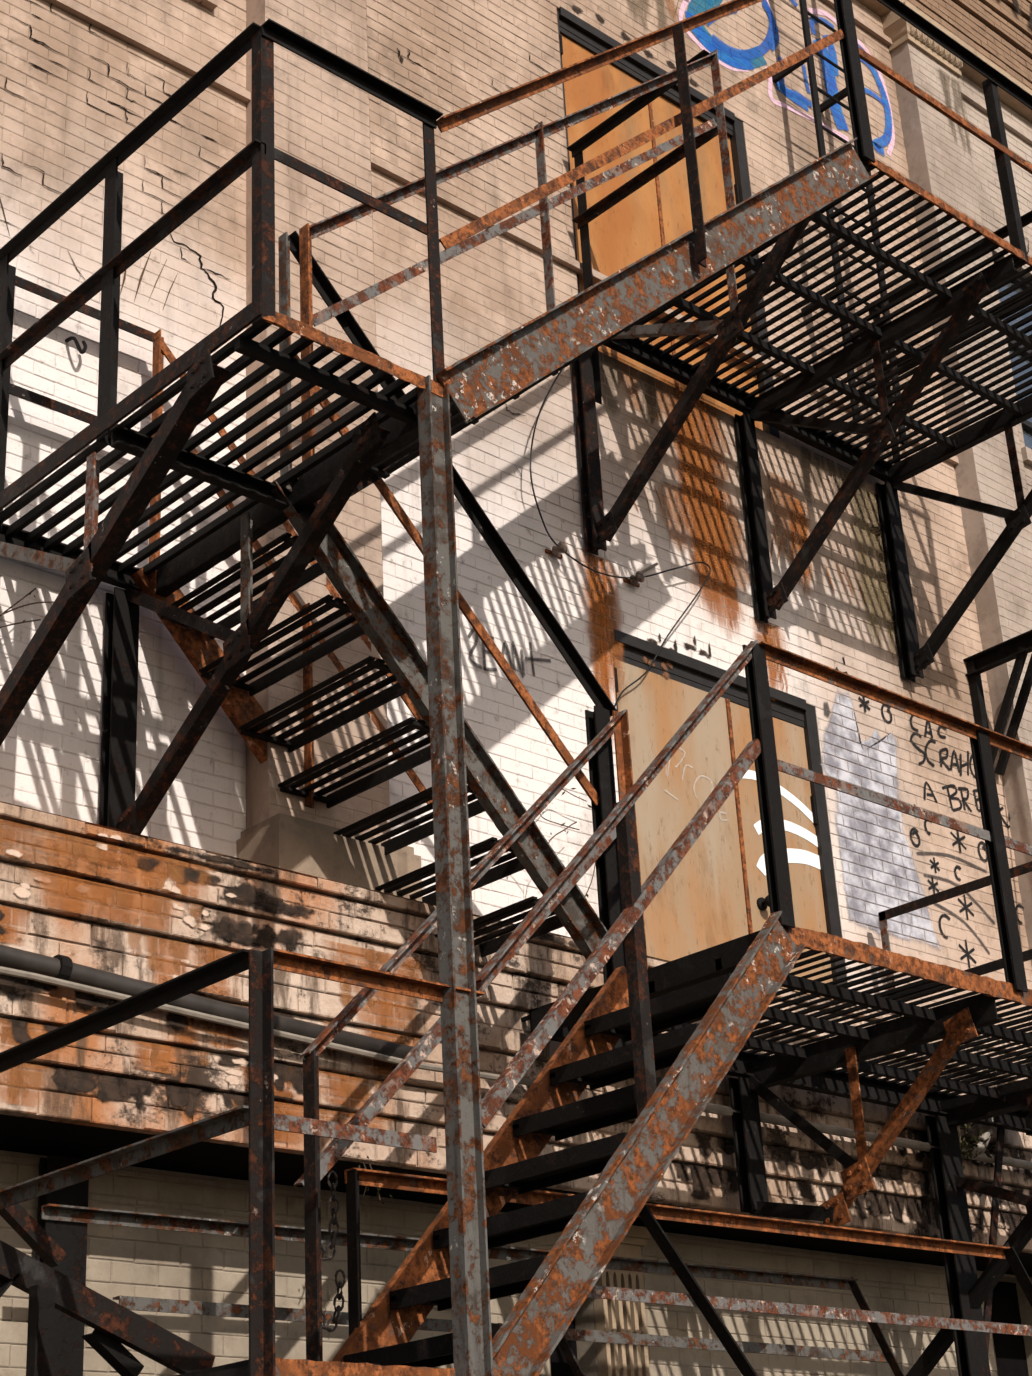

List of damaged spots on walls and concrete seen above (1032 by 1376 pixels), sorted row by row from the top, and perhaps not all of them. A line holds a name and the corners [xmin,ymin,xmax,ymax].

crack [0,0,228,326]
corrosion [679,382,738,630]
corrosion [588,553,614,699]
peeling [6,848,23,857]
peeling [97,833,122,851]
peeling [14,875,52,898]
peeling [162,875,210,931]
damp [675,1133,739,1200]
damp [766,1145,858,1200]
damp [850,1128,939,1228]
damp [961,1139,1032,1237]